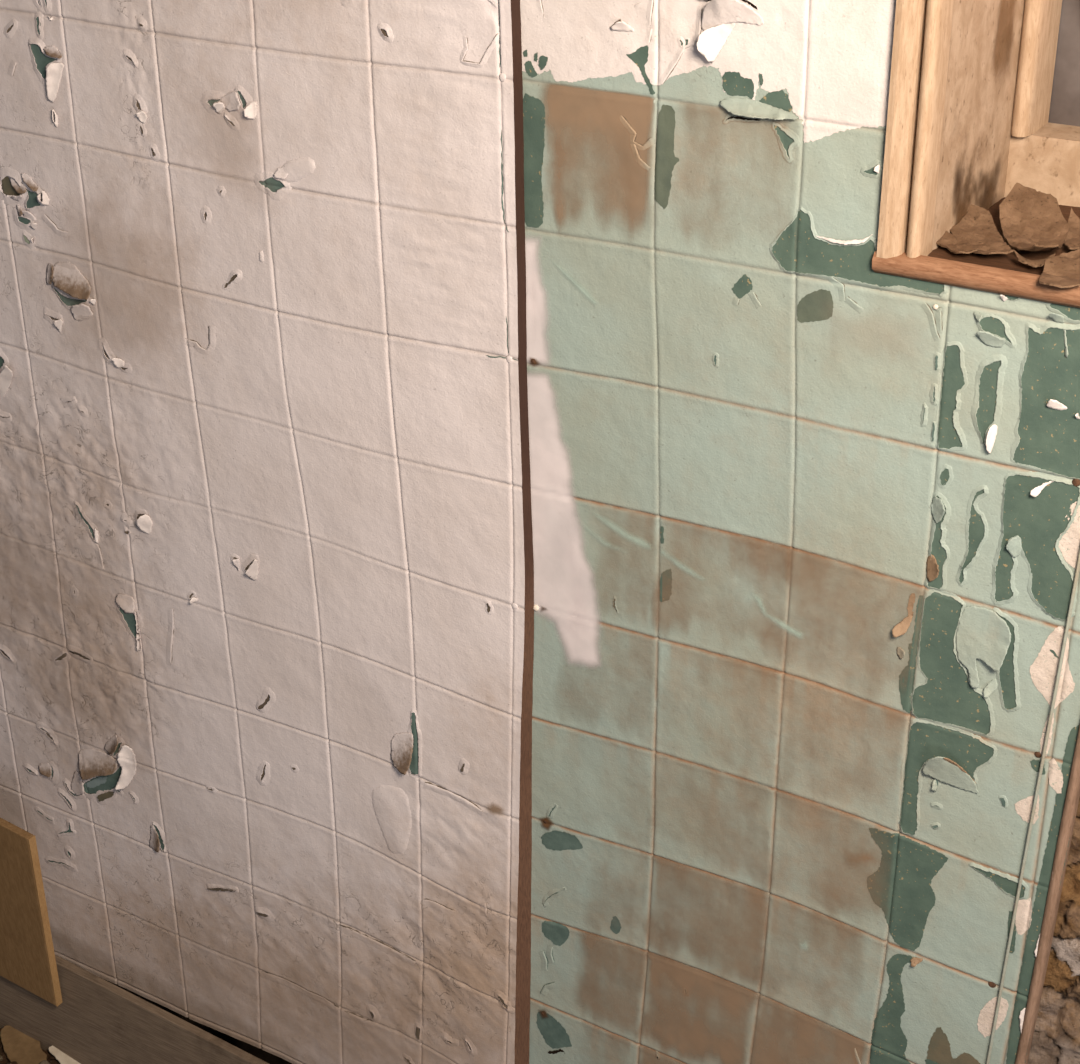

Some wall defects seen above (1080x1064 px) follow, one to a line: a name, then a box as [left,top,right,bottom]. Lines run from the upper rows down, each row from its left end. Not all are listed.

peeling [0,167,50,250]
peeling [28,0,64,127]
peeling [523,93,545,228]
leakage [545,84,653,227]
peeling [626,45,655,95]
peeling [654,105,679,209]
peeling [677,0,764,62]
peeling [720,72,801,165]
peeling [867,302,1080,1064]
peeling [391,710,423,778]
peeling [22,735,139,872]
leakage [626,948,865,1064]